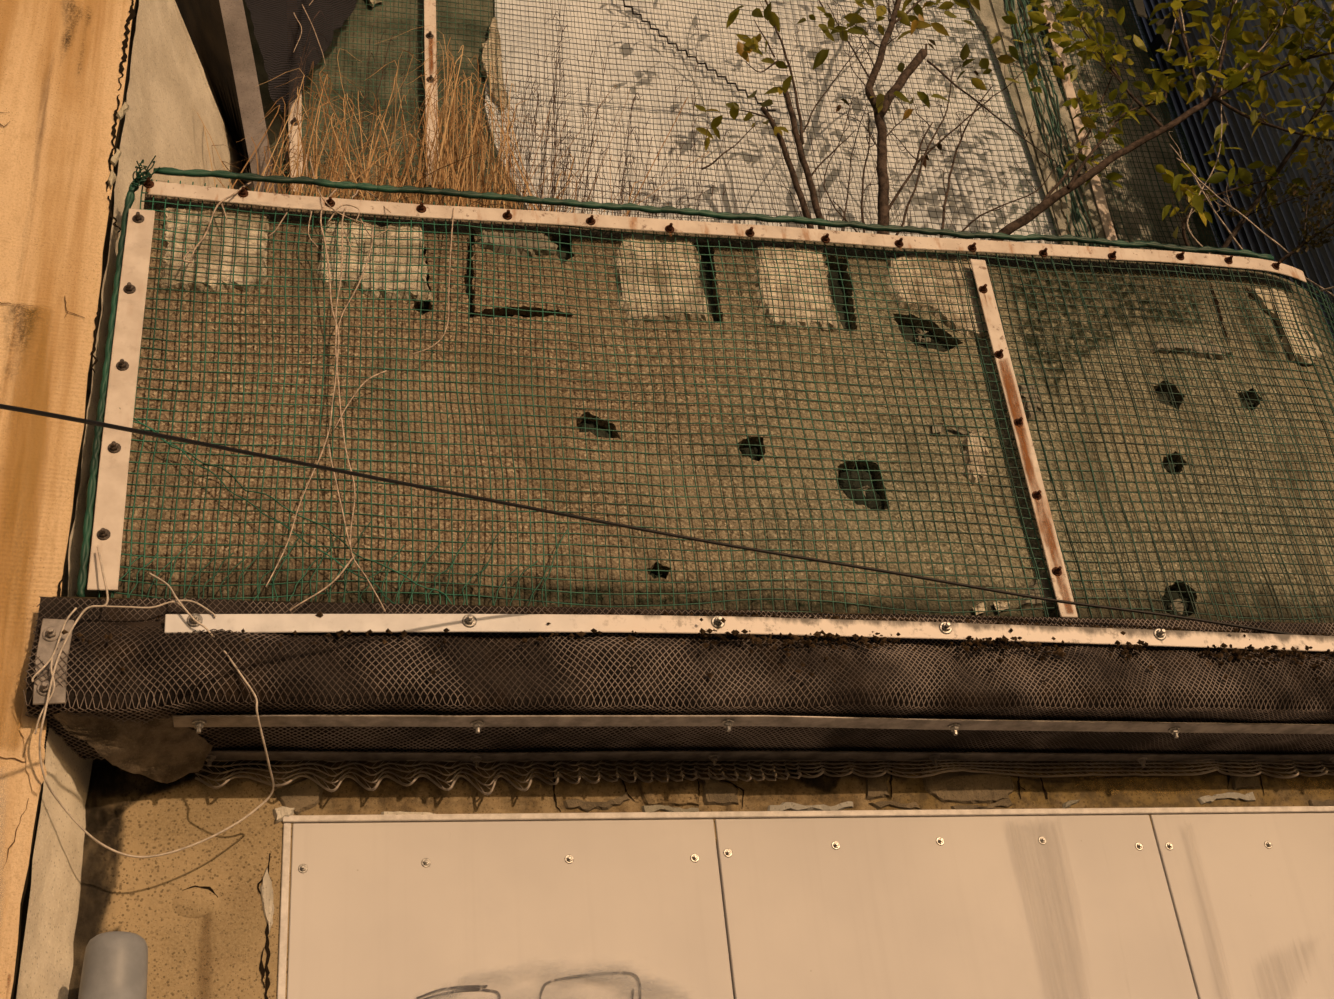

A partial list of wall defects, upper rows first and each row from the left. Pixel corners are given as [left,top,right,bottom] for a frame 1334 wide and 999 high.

crack [0,299,85,319]
rust [1000,361,1073,613]
crack [3,798,29,868]
leakage [76,808,123,944]